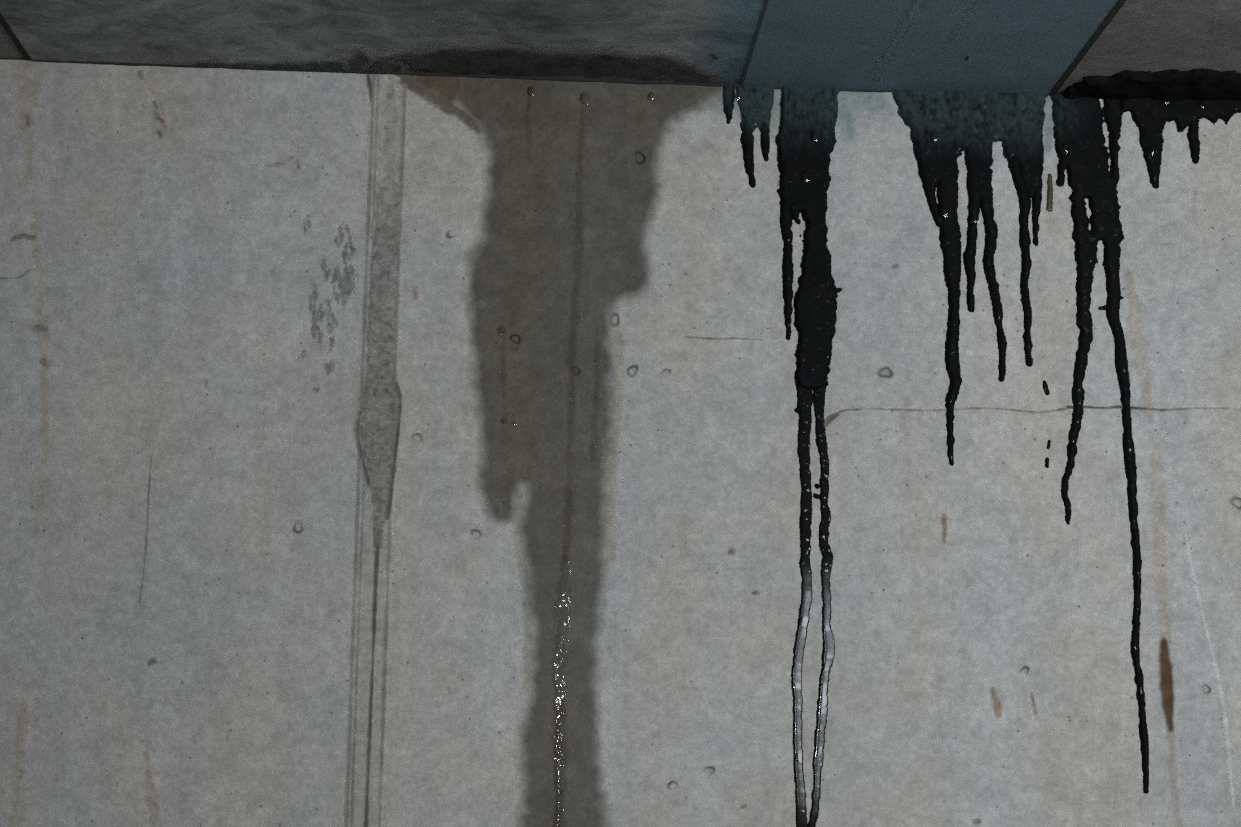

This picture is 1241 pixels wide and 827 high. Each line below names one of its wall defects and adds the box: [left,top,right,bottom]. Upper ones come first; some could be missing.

leakage [770,89,781,133]
leakage [837,91,889,140]
leakage [1043,96,1055,152]
leakage [192,47,741,827]
rust [1152,451,1175,756]